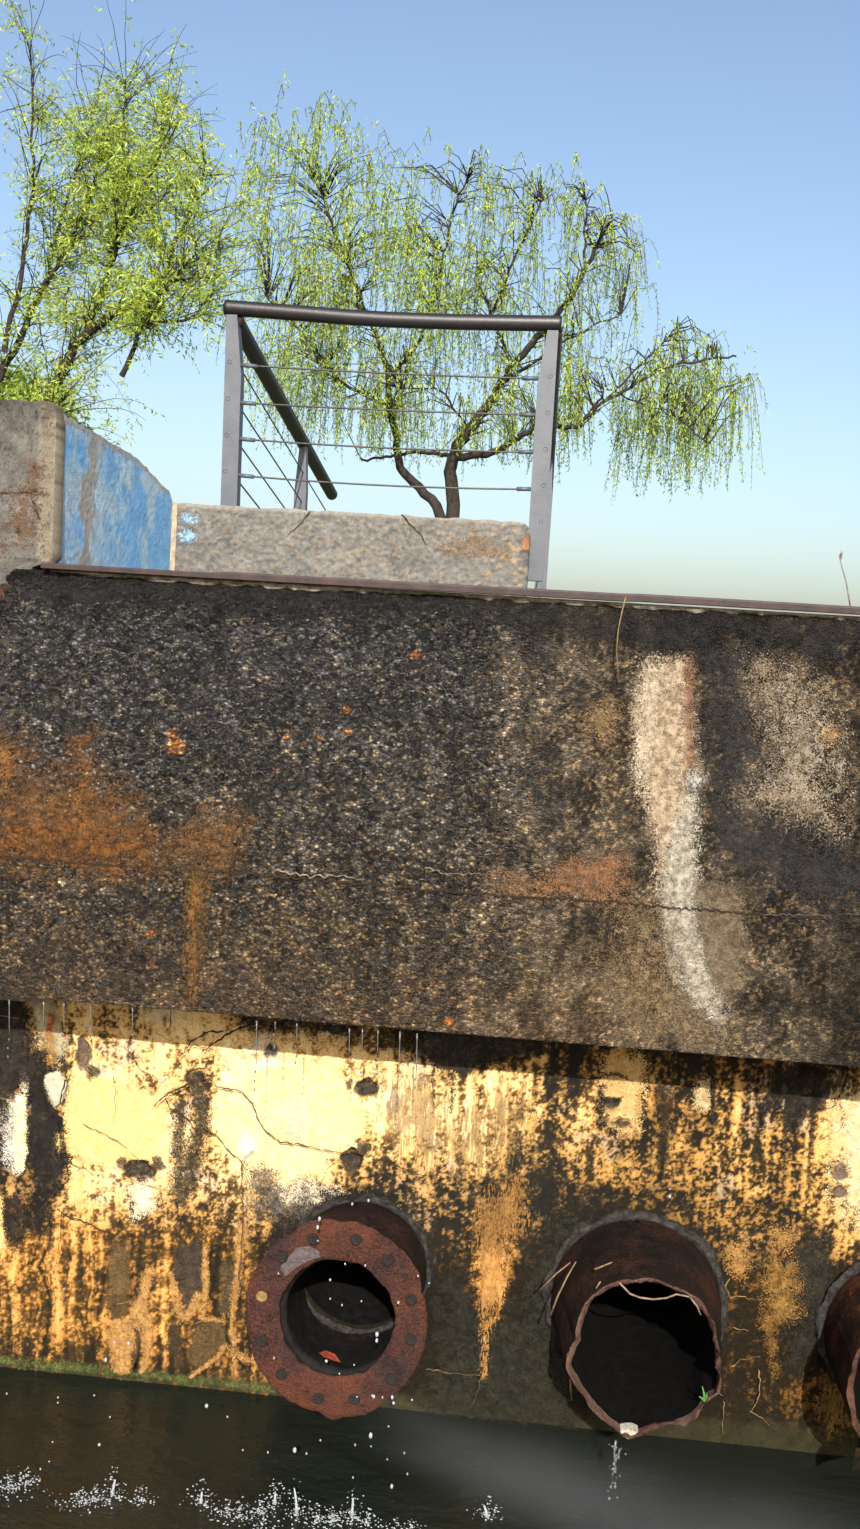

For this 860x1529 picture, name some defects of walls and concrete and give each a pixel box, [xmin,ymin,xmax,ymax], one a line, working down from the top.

damp [16,569,860,1056]
damp [0,1000,68,1254]
damp [166,1075,213,1210]
crack [47,1011,440,1286]
damp [237,1015,543,1192]
damp [594,1070,629,1130]
damp [653,1080,675,1187]
damp [753,1061,860,1208]
crack [47,1209,126,1308]
damp [163,1239,241,1374]
damp [236,1157,603,1432]
damp [620,1423,638,1439]